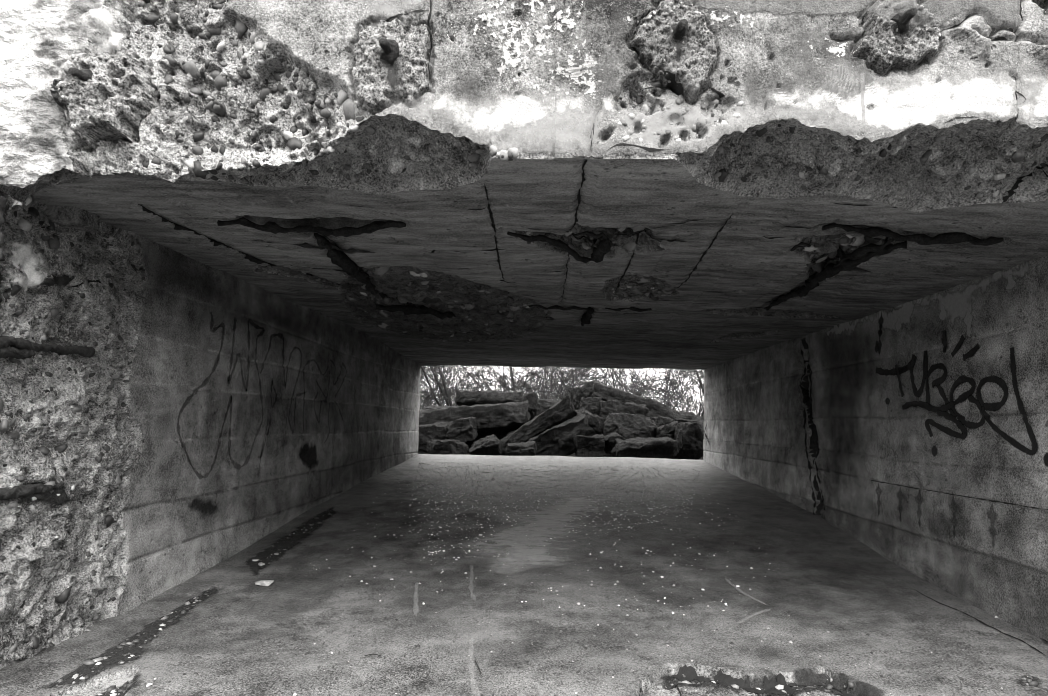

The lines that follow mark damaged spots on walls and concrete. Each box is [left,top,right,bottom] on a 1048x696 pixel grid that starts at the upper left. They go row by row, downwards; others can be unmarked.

spalling [59,0,1048,212]
crack [484,184,505,281]
crack [561,107,671,301]
crack [616,215,732,290]
corrosion [0,336,95,359]
spalling [0,189,148,670]
crack [799,338,825,515]
corrosion [0,477,70,508]
spalling [50,666,140,696]
spalling [640,664,756,696]
crack [665,665,870,696]
spalling [786,672,854,696]